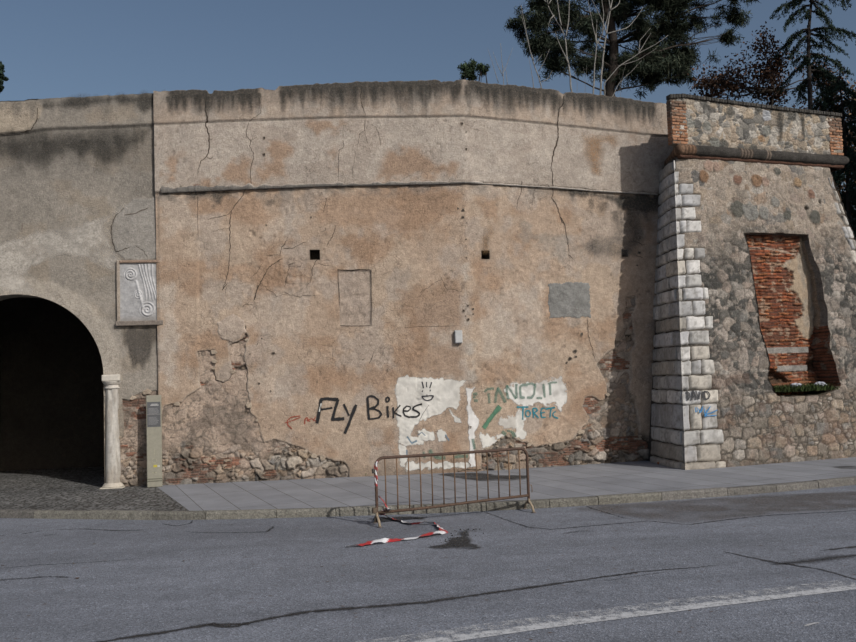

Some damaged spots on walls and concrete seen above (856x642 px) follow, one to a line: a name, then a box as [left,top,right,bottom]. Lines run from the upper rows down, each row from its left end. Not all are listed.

water stain [281,80,655,116]
water stain [0,131,143,160]
crack [517,96,572,269]
crack [111,208,147,256]
crack [197,101,372,344]
water stain [124,326,157,364]
flaking render [449,296,649,471]
flaking render [119,334,348,488]
peeling [418,429,447,442]
peeling [398,444,470,472]